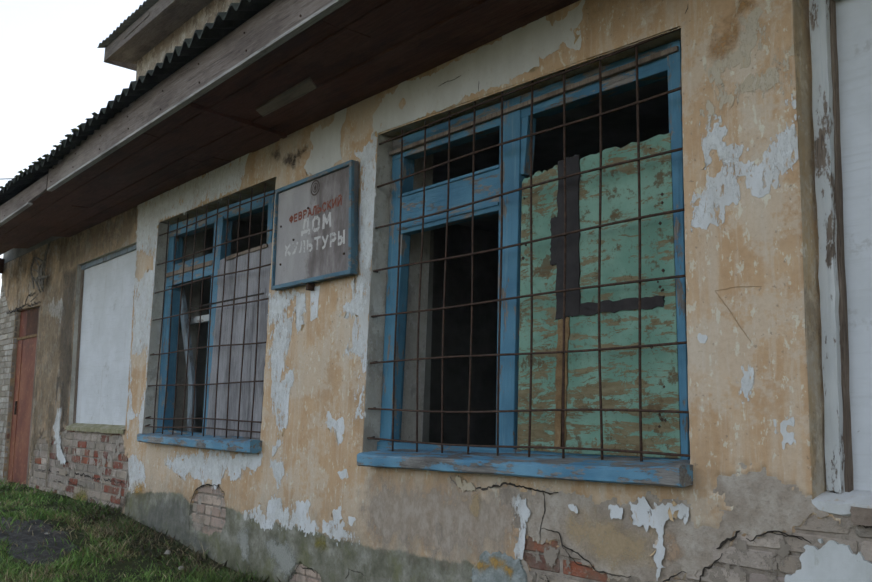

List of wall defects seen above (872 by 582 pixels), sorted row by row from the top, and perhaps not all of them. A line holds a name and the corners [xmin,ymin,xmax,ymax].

peeling [690,44,805,231]
peeling [304,0,585,445]
flaking render [29,153,249,512]
peeling [163,285,360,546]
leakage [266,540,295,578]
flaking render [290,564,321,582]
leakage [361,481,514,557]
crack [450,477,631,578]
spalling [495,462,872,582]
crack [663,530,811,582]